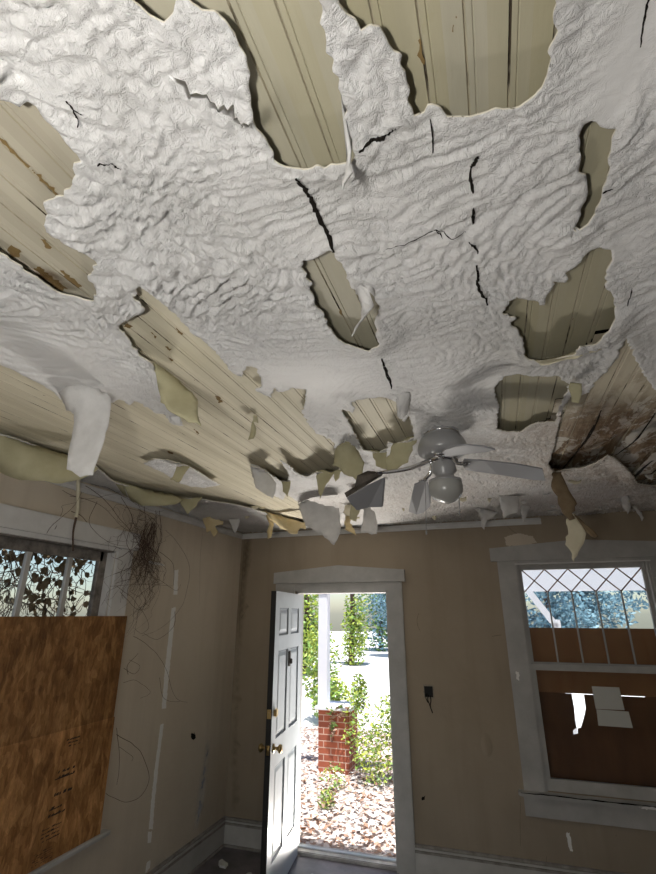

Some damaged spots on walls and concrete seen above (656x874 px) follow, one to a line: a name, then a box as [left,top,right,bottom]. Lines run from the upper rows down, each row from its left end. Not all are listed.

peeling [135,0,176,21]
crack [640,0,650,48]
peeling [168,0,557,189]
peeling [0,100,97,300]
crack [295,178,335,253]
crack [386,156,488,306]
peeling [574,121,615,231]
peeling [302,251,379,350]
peeling [503,247,615,365]
peeling [0,287,417,545]
peeling [495,339,656,561]
peeling [475,495,537,546]